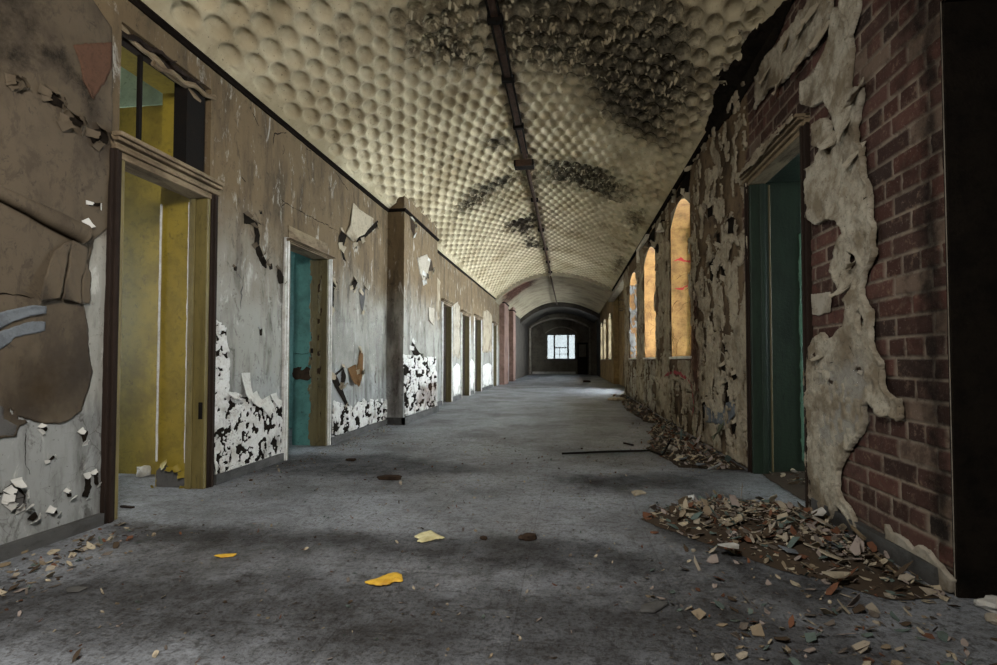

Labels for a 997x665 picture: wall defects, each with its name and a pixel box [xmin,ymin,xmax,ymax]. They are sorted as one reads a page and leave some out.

leakage [406,0,478,68]
leakage [500,0,695,140]
peeling [0,0,114,439]
flaking render [338,203,379,261]
leakage [460,175,513,212]
leakage [504,213,541,248]
leakage [543,160,619,201]
flaking render [502,0,905,531]
peeling [214,320,283,474]
peeling [331,364,387,437]
peeling [403,338,438,416]
peeling [453,302,492,396]